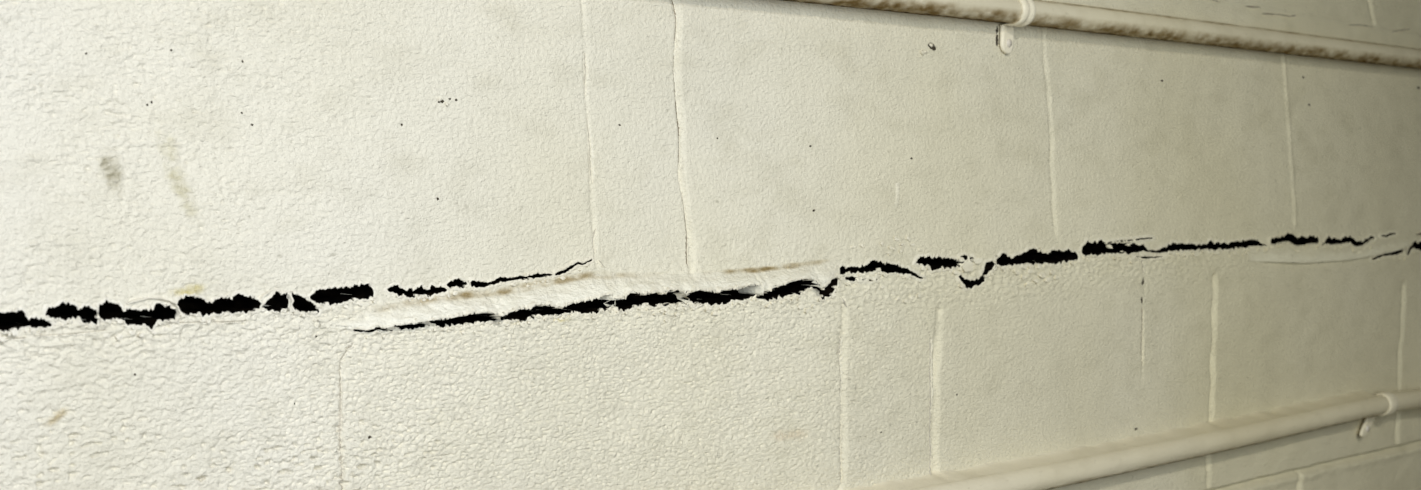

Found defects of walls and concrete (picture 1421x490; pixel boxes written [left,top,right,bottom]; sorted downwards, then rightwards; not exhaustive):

crack [584,53,596,183]
crack [672,0,689,266]
crack [0,229,1421,490]